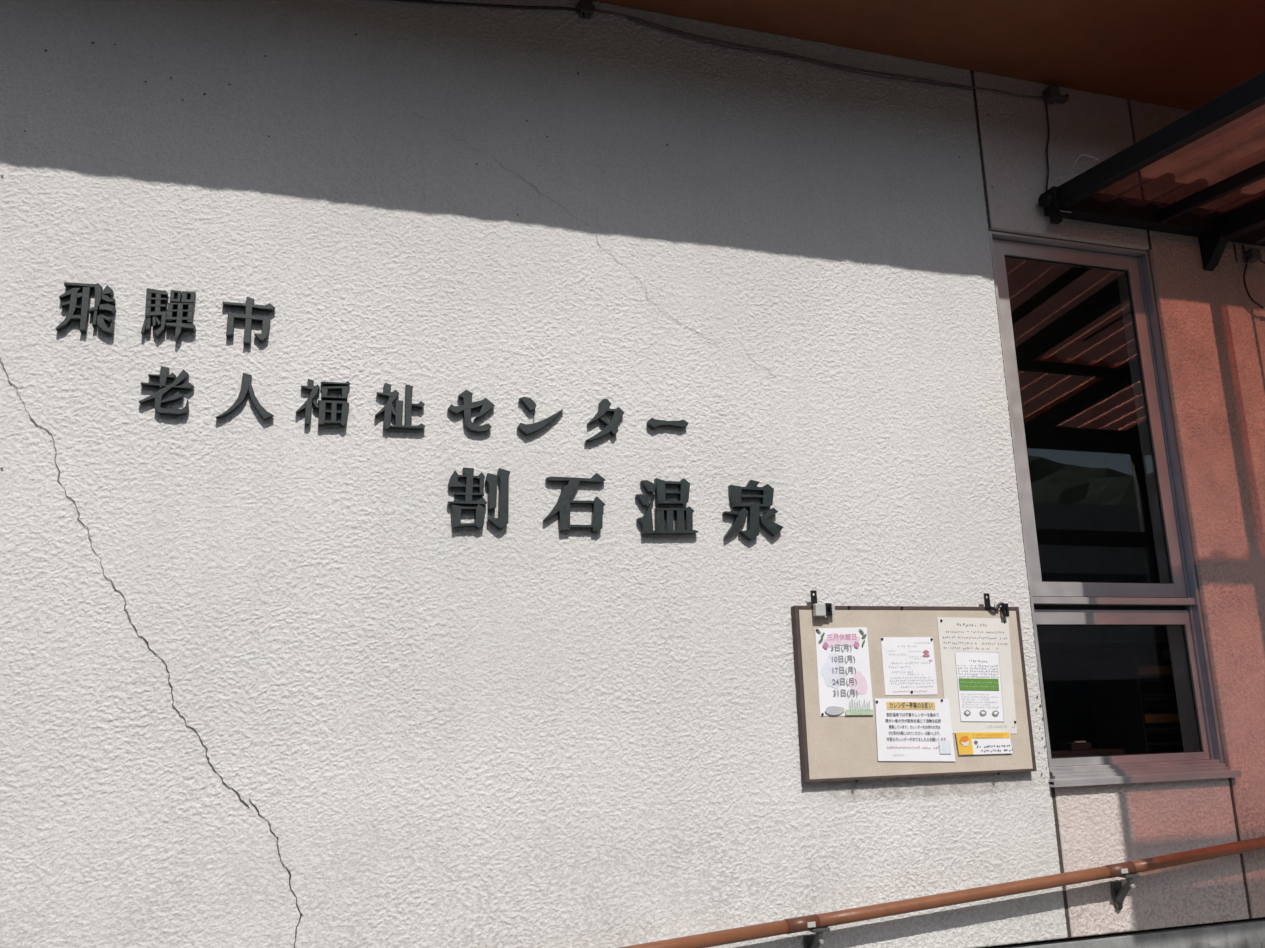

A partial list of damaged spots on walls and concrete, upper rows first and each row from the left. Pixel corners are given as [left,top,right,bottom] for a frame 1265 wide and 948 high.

crack [0,358,303,948]